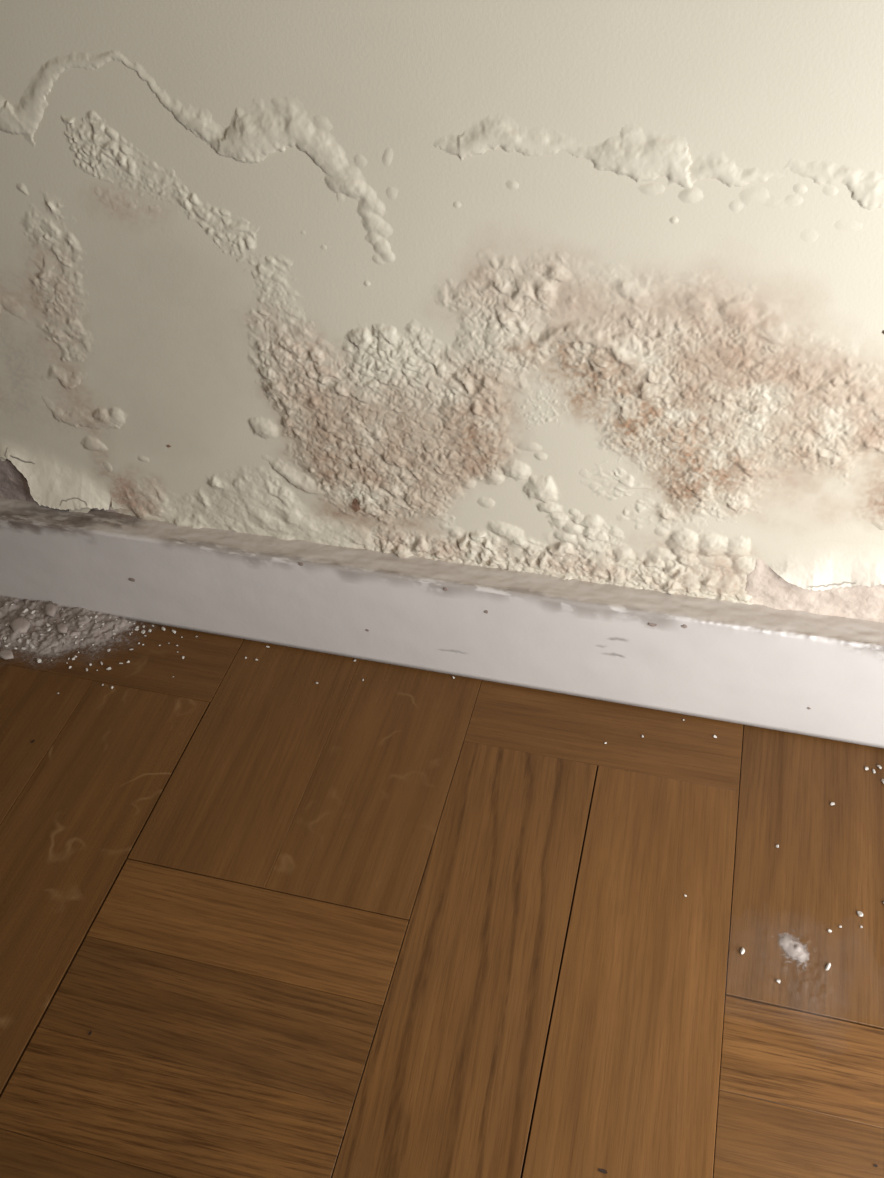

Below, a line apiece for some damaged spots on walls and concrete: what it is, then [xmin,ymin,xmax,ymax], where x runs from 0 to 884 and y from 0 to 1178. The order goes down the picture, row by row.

leakage [618,402,657,435]
peeling [0,434,128,514]
peeling [745,541,884,623]